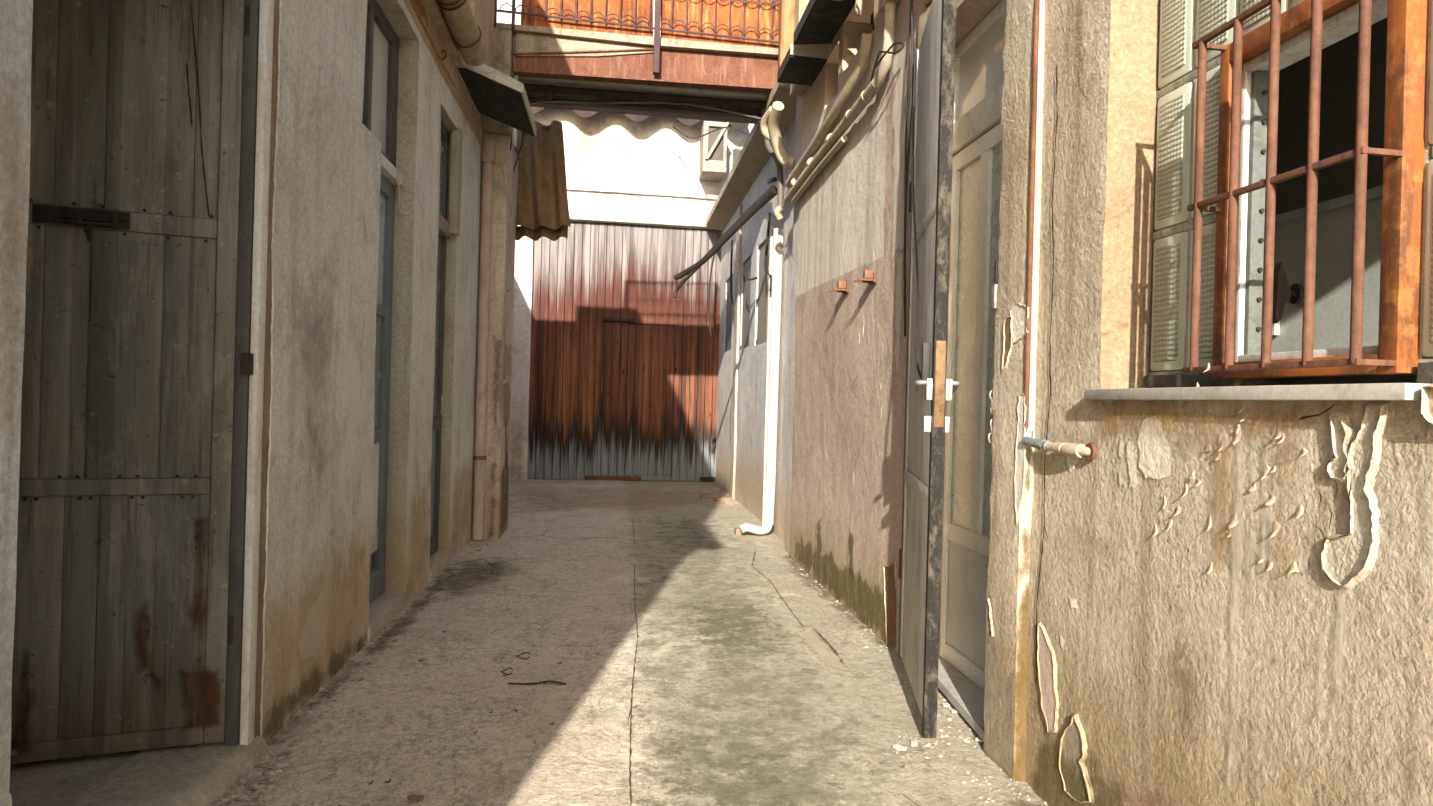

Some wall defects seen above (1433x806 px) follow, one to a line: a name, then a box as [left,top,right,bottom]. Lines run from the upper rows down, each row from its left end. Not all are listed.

crack [1035,67,1058,684]
peeling [1118,415,1171,489]
spalling [1321,401,1389,590]
spalling [1421,383,1433,424]
corrosion [191,519,206,640]
damp [790,522,891,648]
corrosion [11,655,30,750]
corrosion [182,664,220,728]
damp [266,550,509,744]
peeling [1037,622,1094,803]
spalling [0,793,12,806]